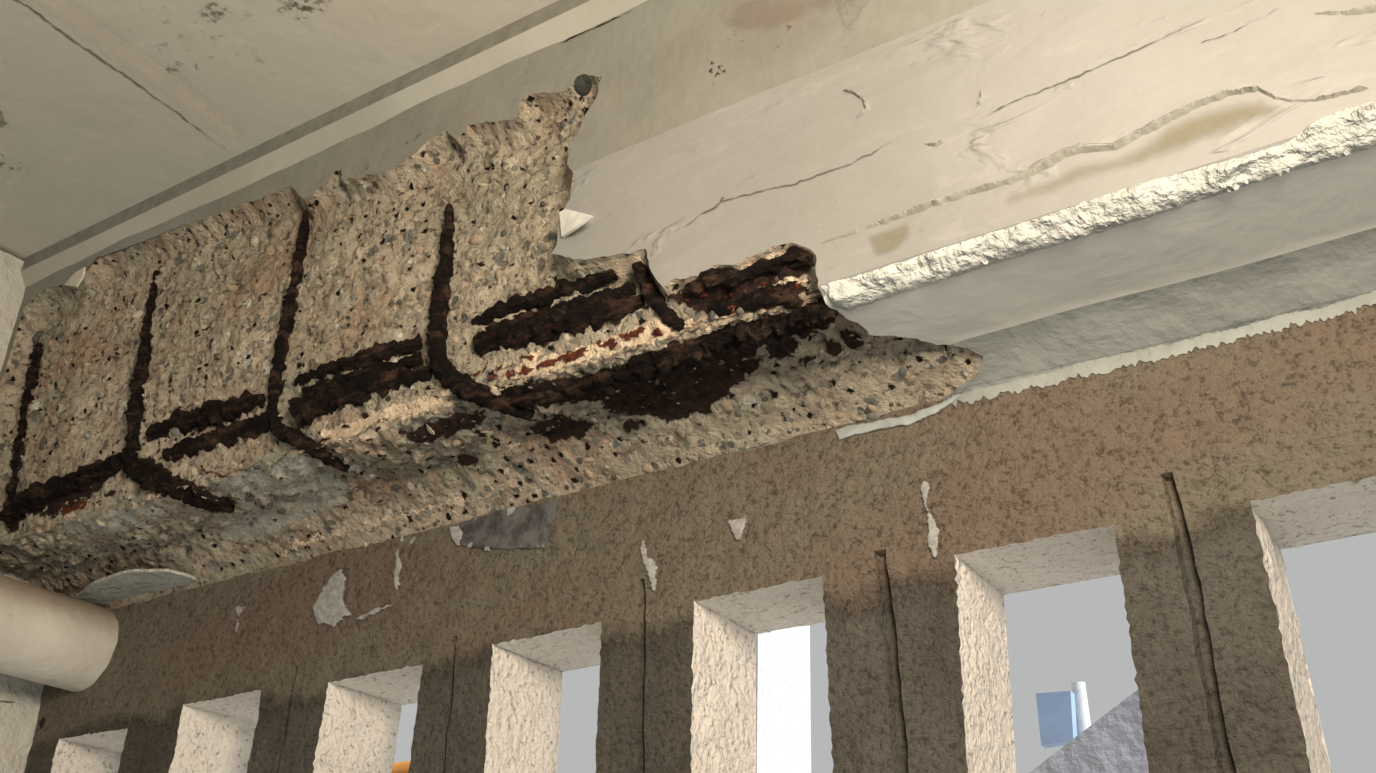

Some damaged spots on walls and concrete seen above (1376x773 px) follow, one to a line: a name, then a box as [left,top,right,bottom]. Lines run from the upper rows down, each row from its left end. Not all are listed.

crack [15,0,201,131]
corrosion [3,388,236,534]
corrosion [310,412,381,466]
corrosion [398,410,514,467]
spalling [0,74,983,609]
corrosion [470,322,865,452]
corrosion [665,264,810,315]